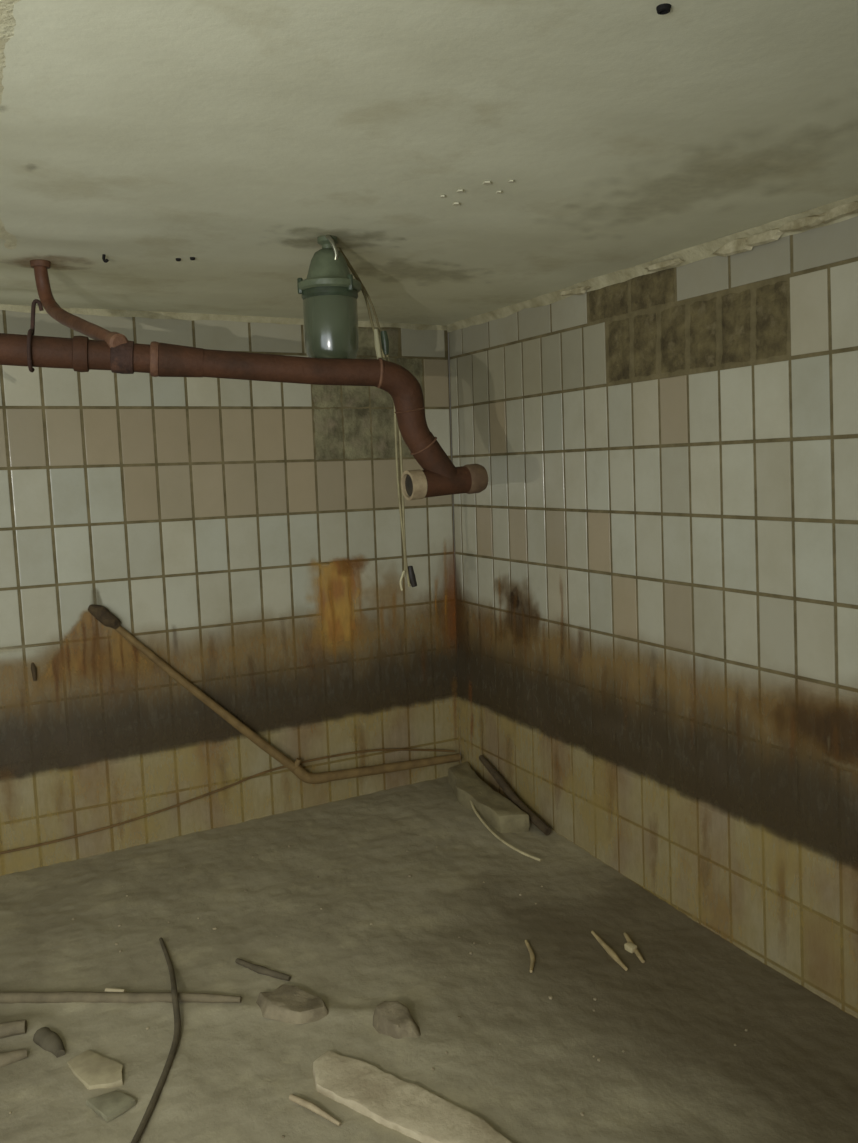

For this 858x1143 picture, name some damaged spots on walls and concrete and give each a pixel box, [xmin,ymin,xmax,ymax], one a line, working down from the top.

crack [0,0,20,104]
rust [43,611,150,679]
rust [317,560,362,644]
rust [499,583,539,642]
damp [0,601,858,1019]